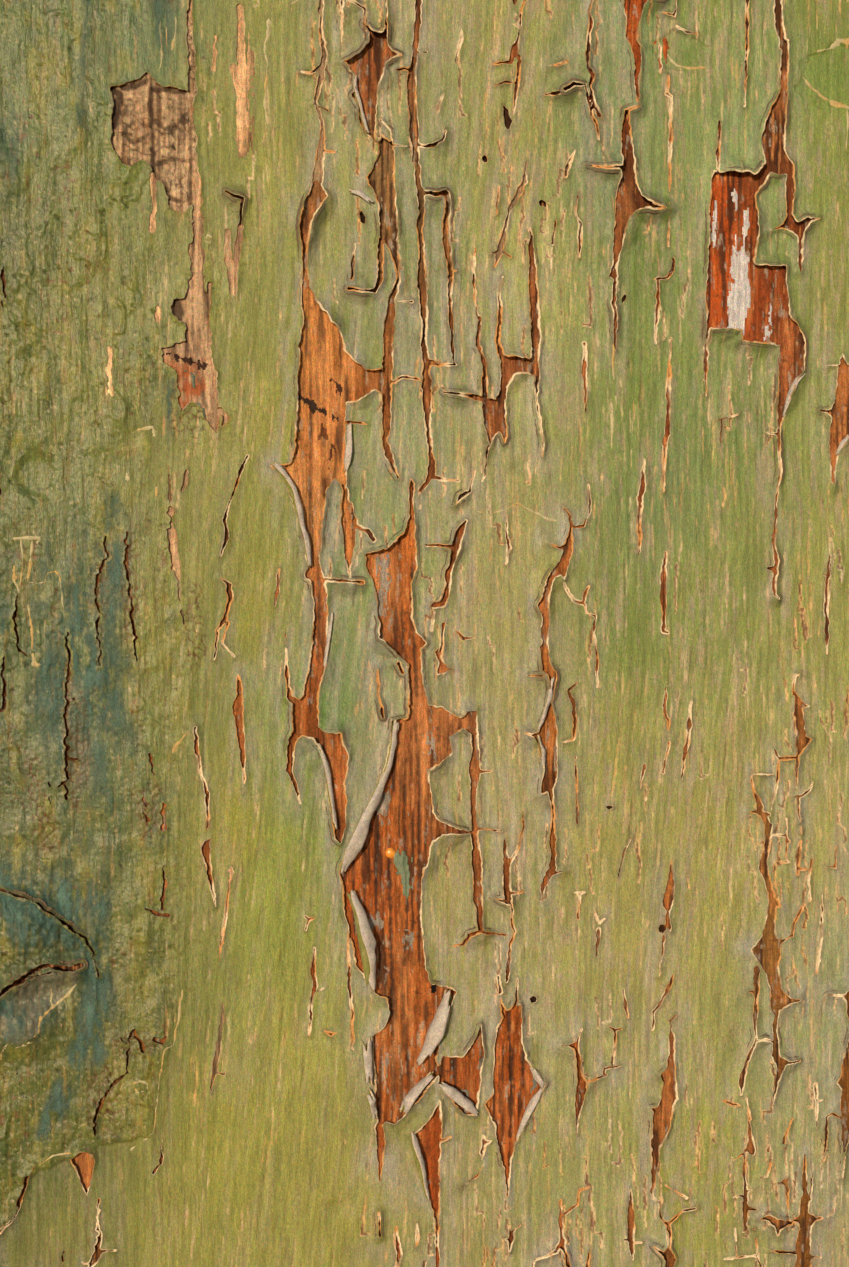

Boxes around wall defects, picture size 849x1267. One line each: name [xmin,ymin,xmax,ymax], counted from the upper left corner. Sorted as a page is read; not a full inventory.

spalling [817,0,849,53]
peeling [110,0,272,433]
peeling [701,39,849,602]
crack [0,595,27,713]
crack [47,531,138,805]
crack [141,753,167,831]
peeling [270,8,549,1267]
peeling [478,502,576,899]
crack [0,886,100,998]
peeling [823,988,849,1178]